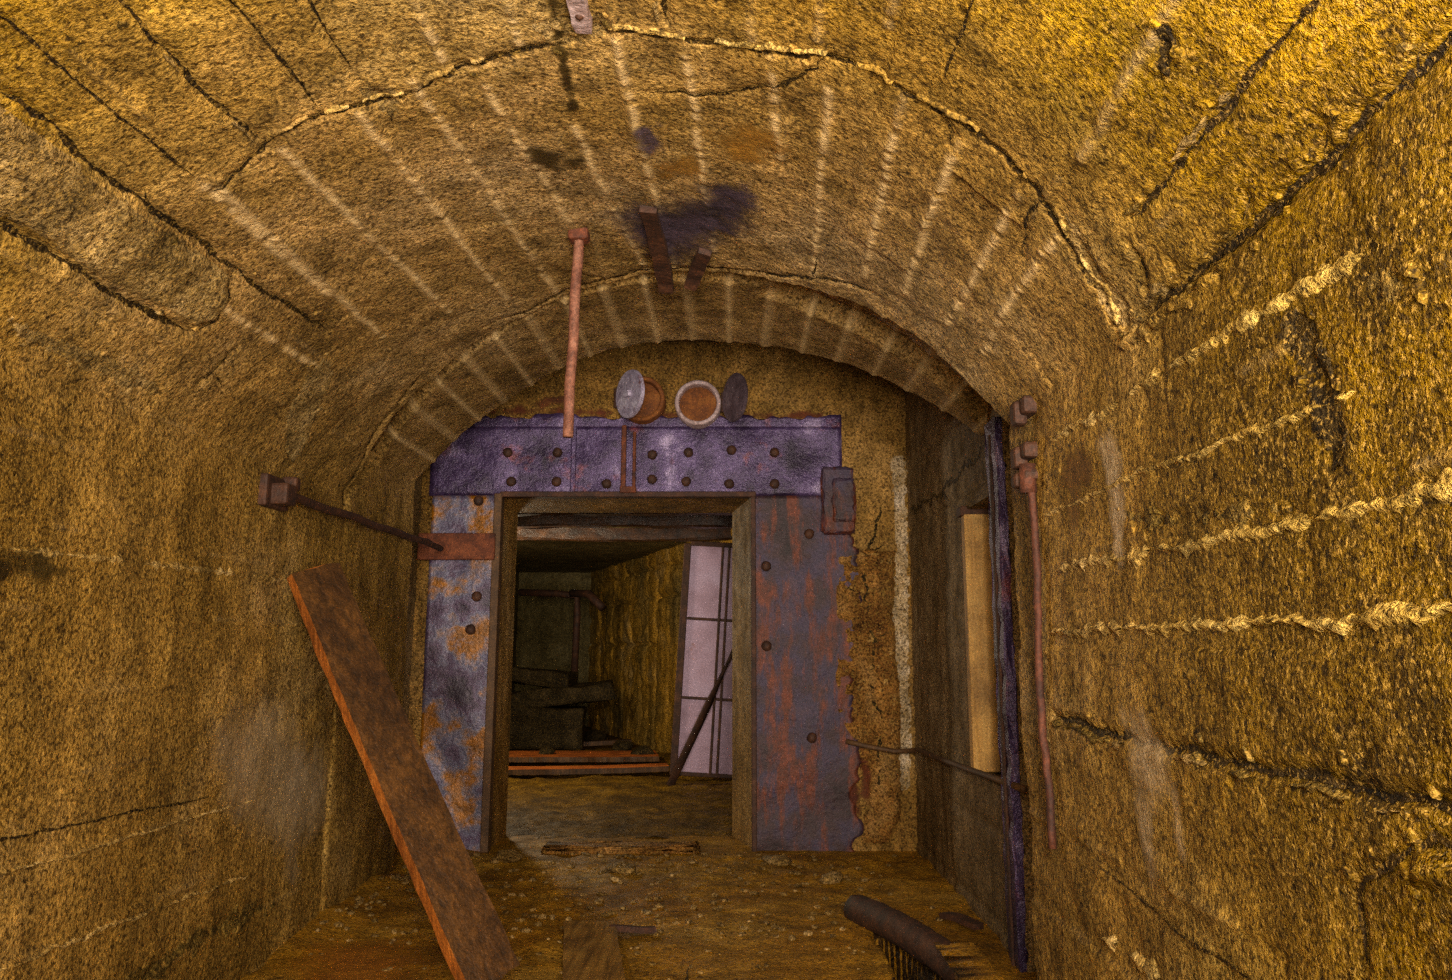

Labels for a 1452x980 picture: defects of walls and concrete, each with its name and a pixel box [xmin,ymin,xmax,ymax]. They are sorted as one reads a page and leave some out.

water stain [634,127,659,153]
crack [0,0,1452,337]
crack [0,92,329,389]
water stain [622,186,757,260]
crack [0,797,207,856]